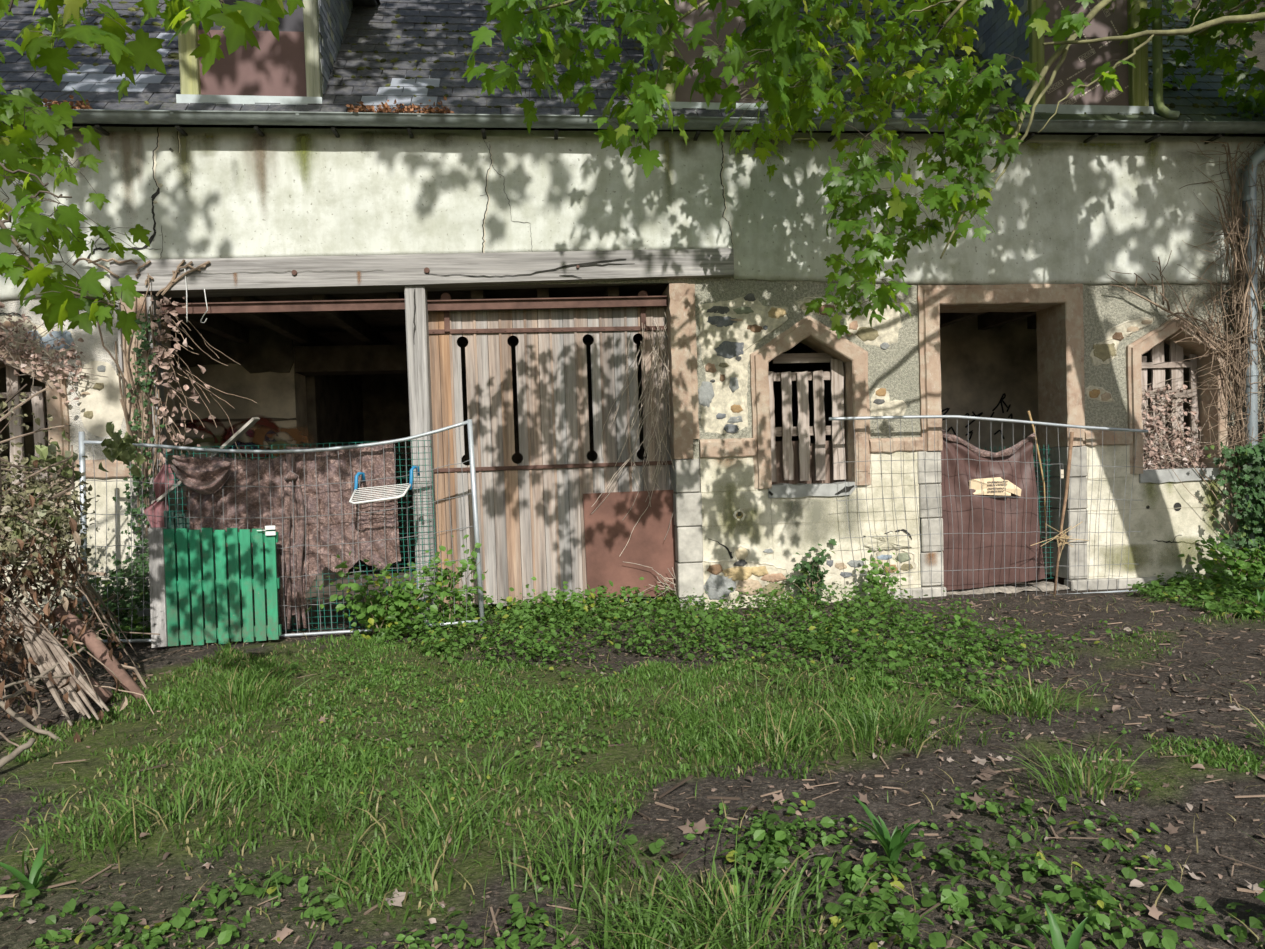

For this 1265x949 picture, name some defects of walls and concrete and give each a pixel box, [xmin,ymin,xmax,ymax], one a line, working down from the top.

damp [178,134,215,173]
crack [87,127,374,275]
damp [295,135,312,165]
crack [413,137,635,338]
crack [720,135,734,248]
flaking render [698,293,907,434]
flaking render [1090,316,1155,366]
flaking render [702,544,917,605]